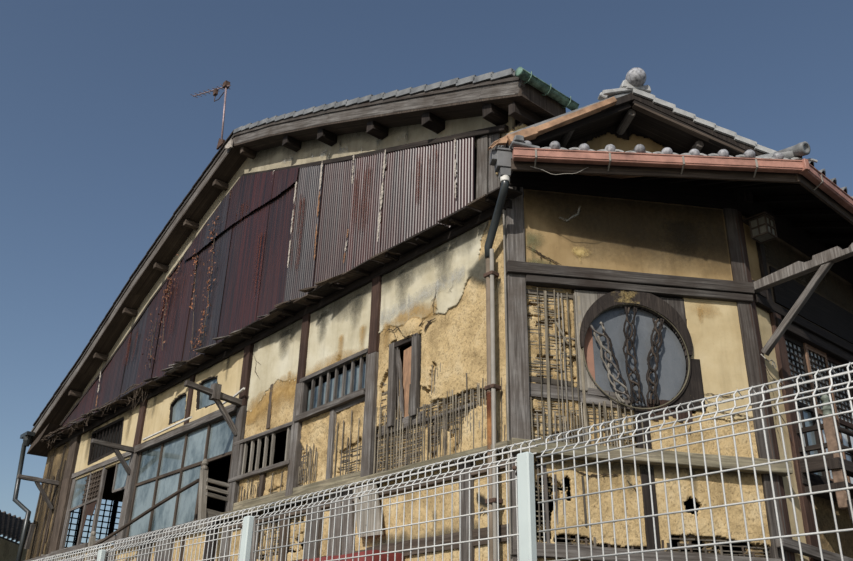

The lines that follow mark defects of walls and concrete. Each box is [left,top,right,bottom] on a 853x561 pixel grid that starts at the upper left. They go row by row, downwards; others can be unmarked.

leakage [382,223,483,286]
leakage [269,319,302,344]
leakage [317,282,372,328]
leakage [381,253,486,335]
peeling [419,214,507,461]
peeling [375,320,408,429]
peeling [244,379,295,439]
crack [700,393,749,420]